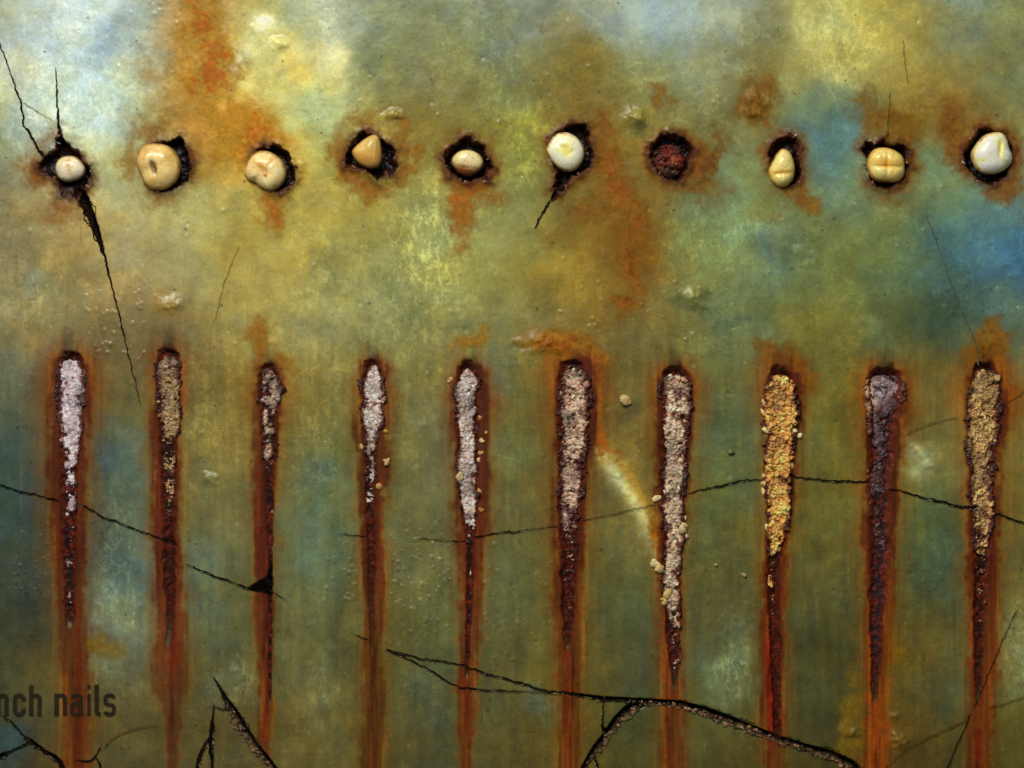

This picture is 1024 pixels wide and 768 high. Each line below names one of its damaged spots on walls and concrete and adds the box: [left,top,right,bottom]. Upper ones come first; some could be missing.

crack [0,43,62,156]
corrosion [42,349,123,768]
crack [73,187,141,405]
crack [0,484,286,600]
crack [196,677,277,768]
corrosion [351,354,393,768]
corrosion [445,325,497,768]
corrosion [522,329,618,768]
corrosion [648,361,699,768]
crack [355,609,1024,768]
corrosion [754,341,815,766]
crack [790,474,1024,523]